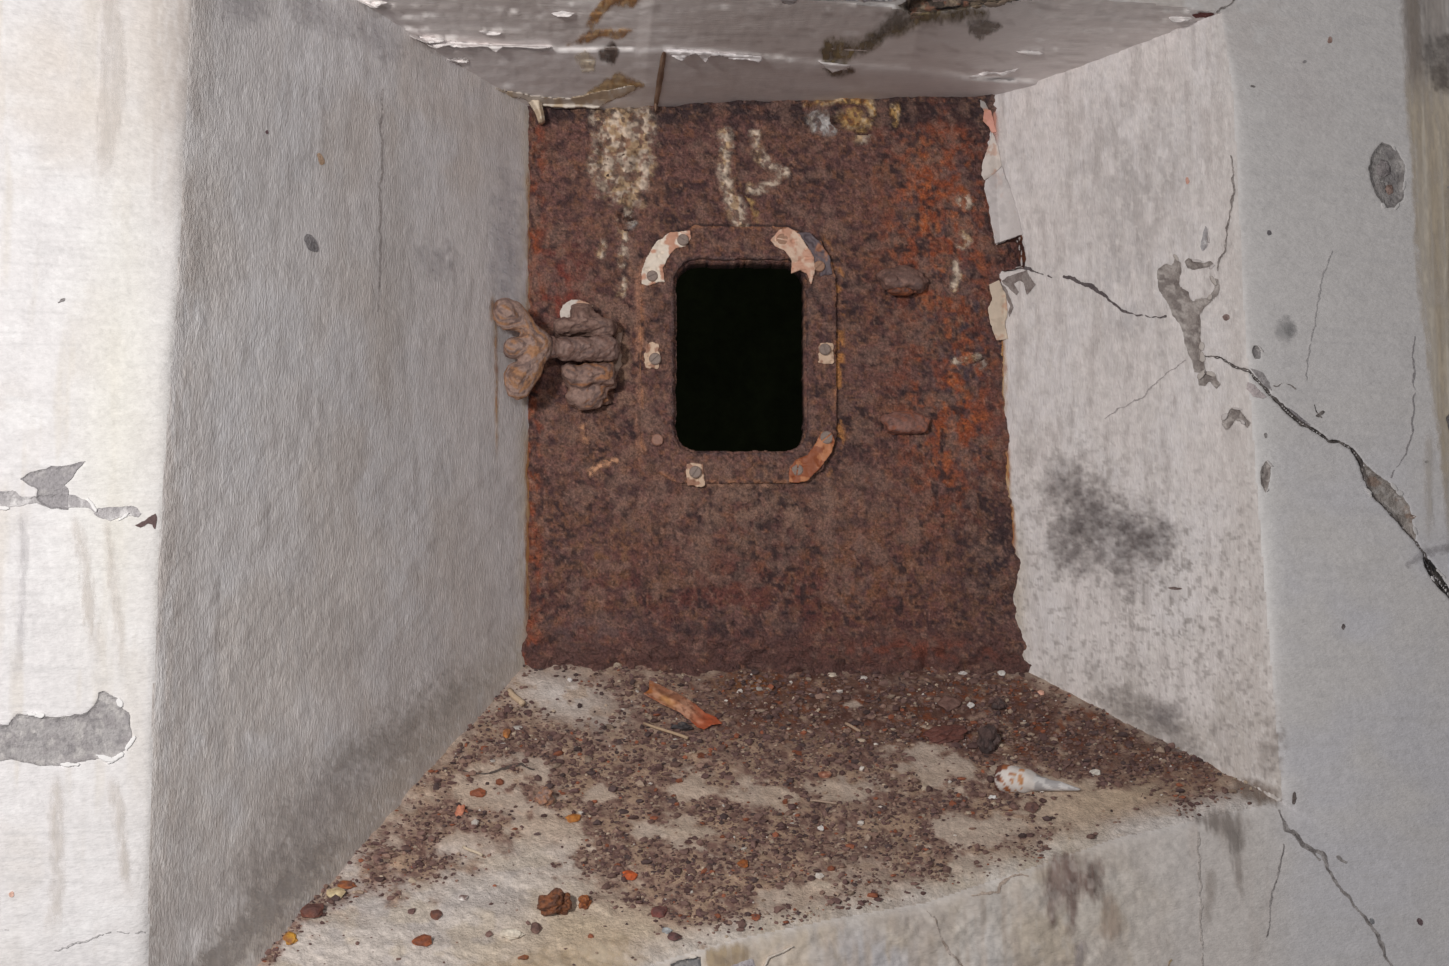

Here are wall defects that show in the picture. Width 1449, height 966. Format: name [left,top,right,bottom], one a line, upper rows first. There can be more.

spalling [842,0,1015,19]
spalling [1368,142,1406,210]
crack [1023,266,1167,318]
spalling [1157,226,1220,389]
leakage [1403,0,1449,529]
crack [1104,251,1449,598]
spalling [0,461,157,529]
leakage [1061,494,1170,573]
spalling [0,691,136,767]
crack [1266,810,1393,966]